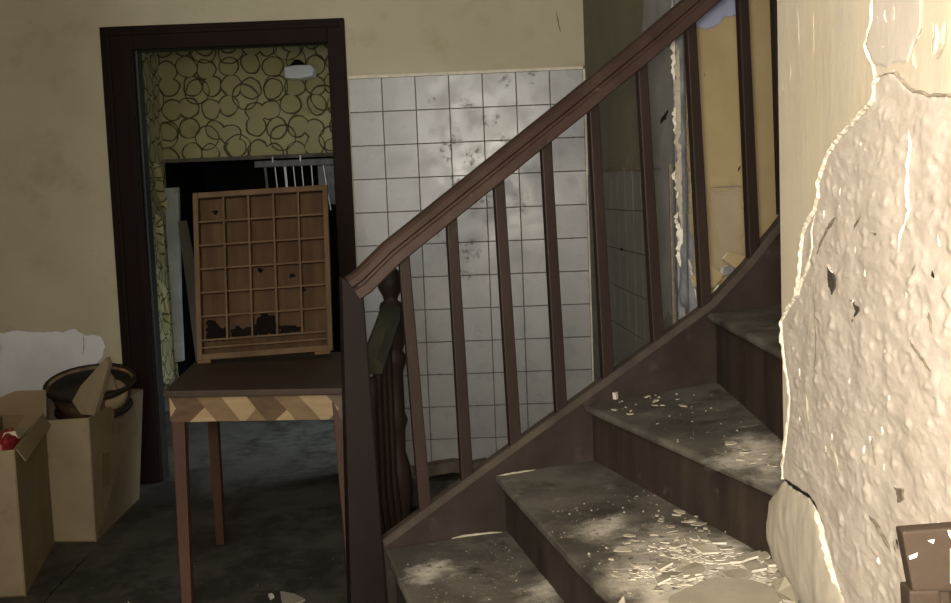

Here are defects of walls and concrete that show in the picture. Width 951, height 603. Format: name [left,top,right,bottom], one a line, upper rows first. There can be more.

peeling [725,0,951,603]
peeling [0,328,105,398]
crack [784,478,826,530]